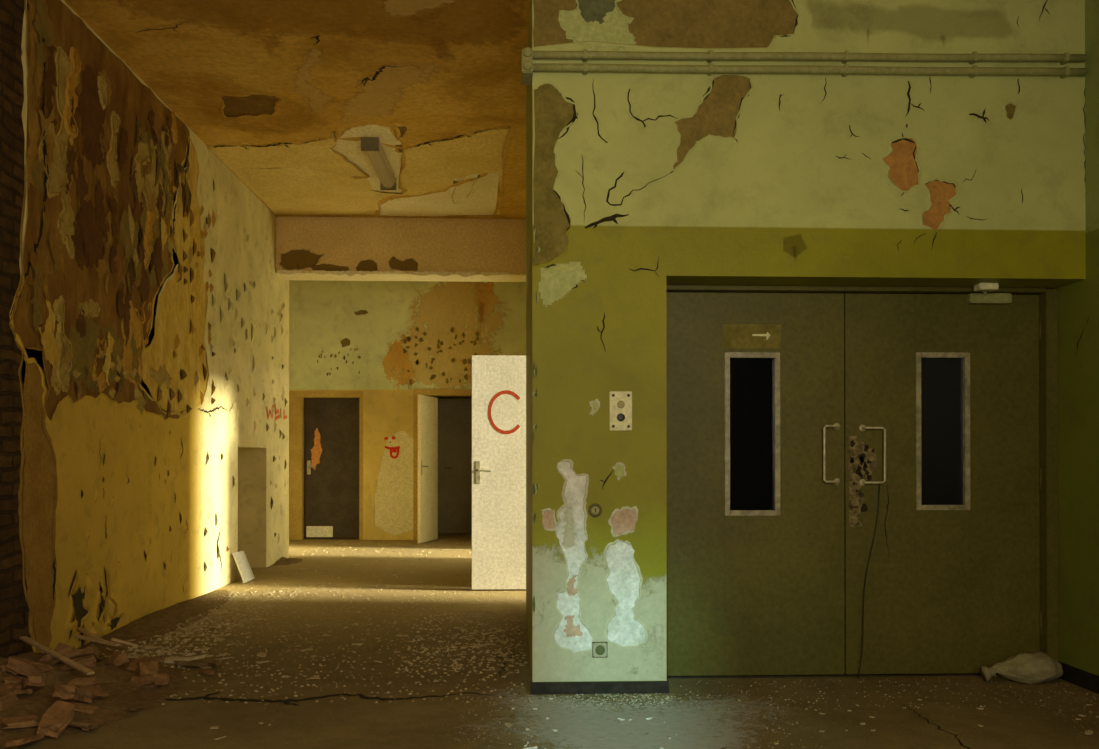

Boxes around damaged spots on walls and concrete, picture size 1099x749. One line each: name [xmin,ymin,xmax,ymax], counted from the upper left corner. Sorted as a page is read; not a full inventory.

peeling [533,0,801,52]
peeling [533,81,578,269]
crack [558,80,608,143]
crack [553,157,674,231]
crack [627,89,677,128]
peeling [671,73,754,174]
flaking render [881,136,959,233]
crack [892,78,985,220]
crack [969,108,989,123]
crack [630,256,660,277]
flaking render [0,0,516,661]
flaking render [533,459,648,654]